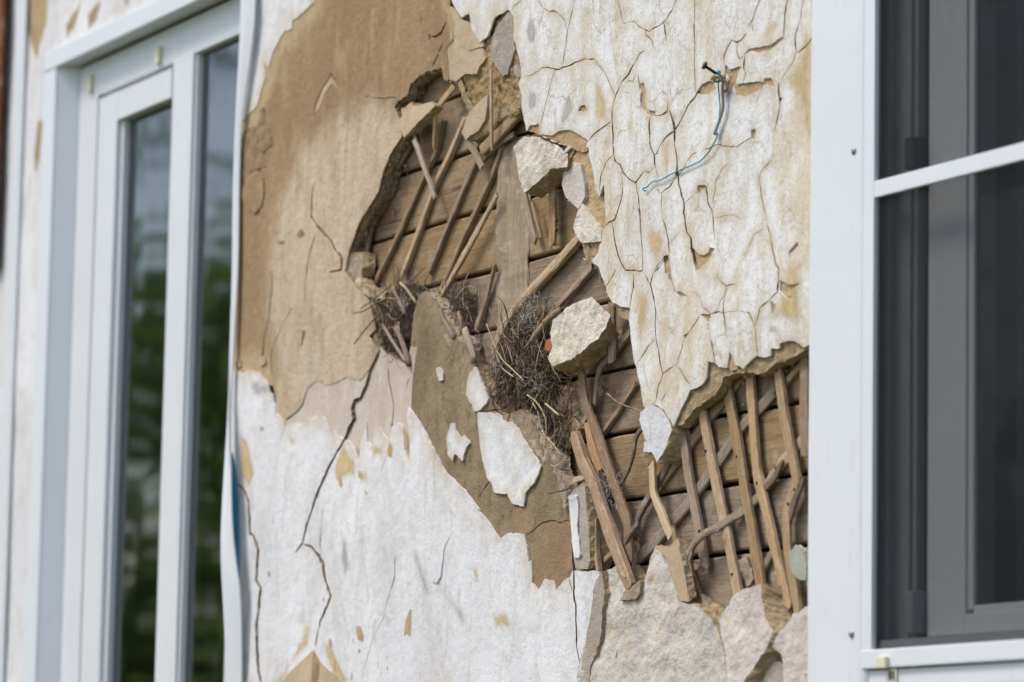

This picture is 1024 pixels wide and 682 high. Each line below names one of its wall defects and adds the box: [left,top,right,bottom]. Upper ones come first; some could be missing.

peeling [640,83,656,116]
peeling [699,66,774,97]
crack [513,0,812,405]
crack [262,185,343,372]
peeling [234,0,606,589]
spalling [613,303,630,320]
peeling [665,256,687,297]
peeling [694,248,715,270]
spalling [676,341,809,429]
crack [295,351,409,646]
crack [237,484,262,682]
peeling [789,545,808,580]